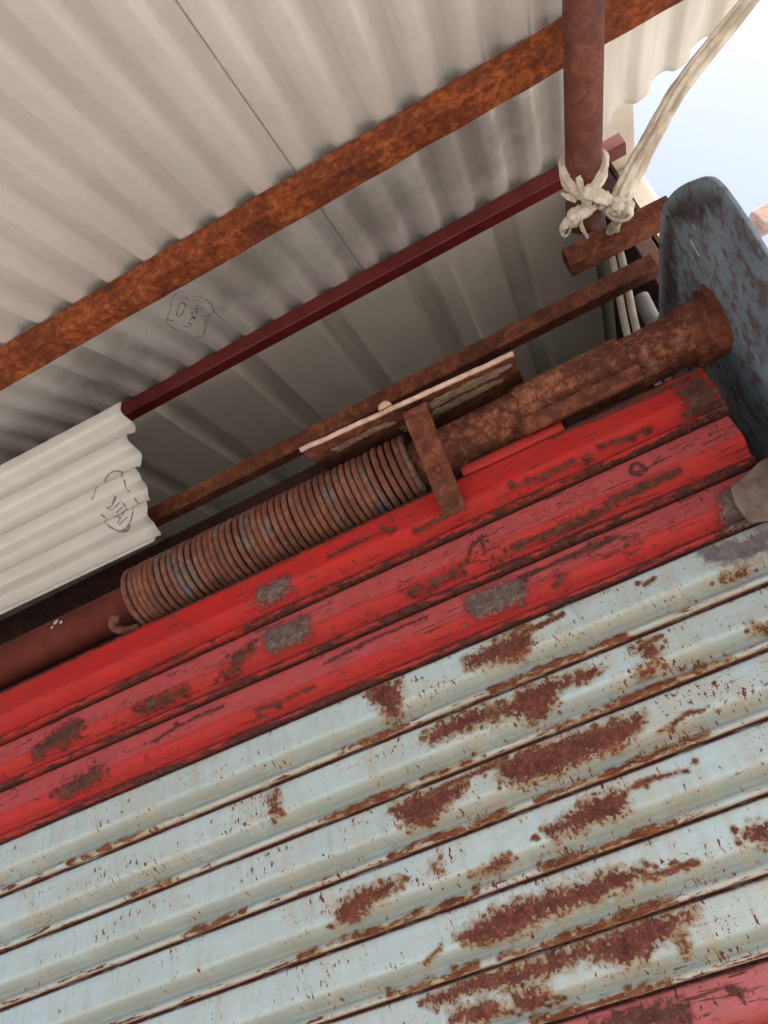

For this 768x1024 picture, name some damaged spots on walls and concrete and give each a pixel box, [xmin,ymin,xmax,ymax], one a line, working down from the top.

peeling [245,572,298,611]
peeling [462,535,627,627]
peeling [213,612,316,682]
peeling [131,683,192,716]
peeling [28,717,87,763]
rust [318,610,734,872]
peeling [48,765,110,803]
rust [297,851,519,961]
rust [385,858,701,1024]